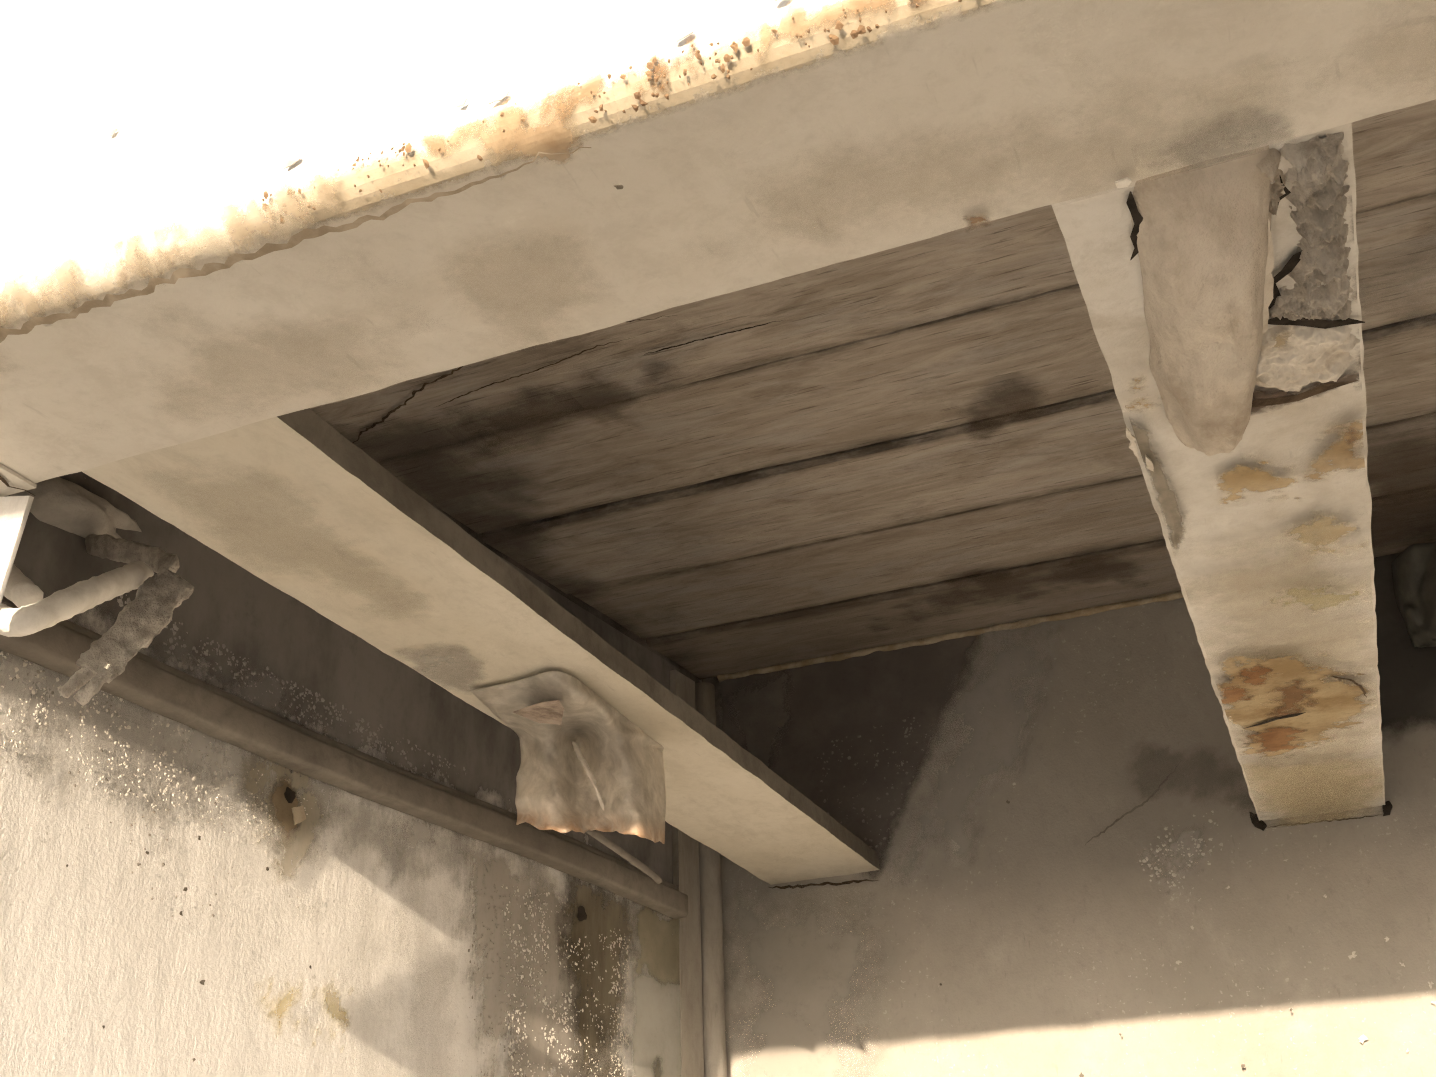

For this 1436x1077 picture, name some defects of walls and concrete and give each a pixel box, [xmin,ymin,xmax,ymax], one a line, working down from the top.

crack [1126,191,1143,260]
spalling [1251,132,1360,414]
crack [1268,250,1365,329]
crack [353,315,783,443]
crack [0,476,35,496]
corrosion [1217,421,1365,504]
damp [13,512,127,599]
damp [59,471,521,814]
corrosion [1217,656,1370,757]
peeling [471,671,666,844]
damp [565,821,673,884]
damp [468,852,629,1077]